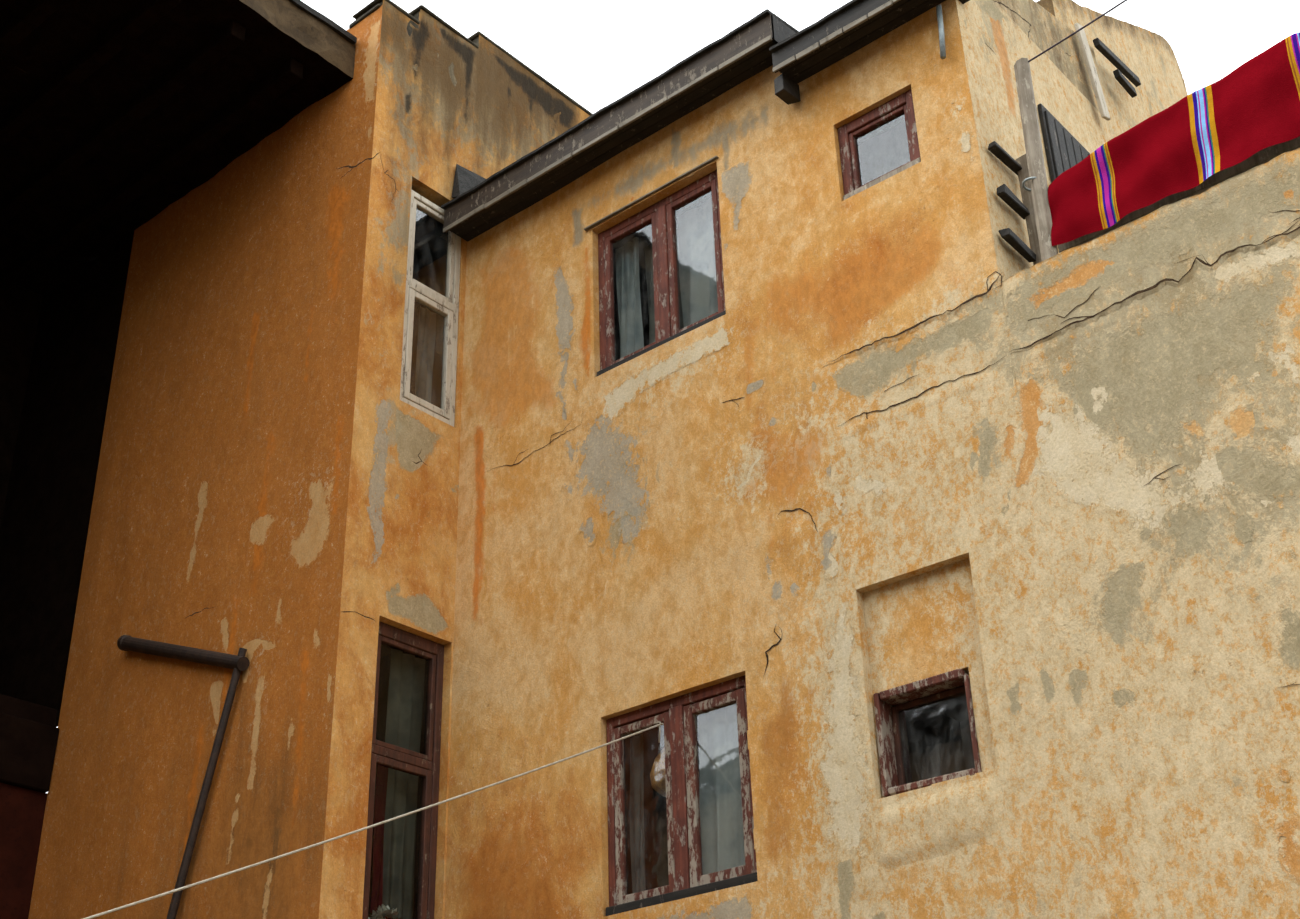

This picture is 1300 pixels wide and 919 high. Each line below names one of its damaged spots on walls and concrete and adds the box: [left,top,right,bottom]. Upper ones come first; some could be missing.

flaking render [553,262,580,420]
flaking render [832,308,993,402]
crack [822,210,1300,427]
flaking render [395,409,441,475]
crack [493,422,582,469]
flaking render [559,405,654,549]
flaking render [1055,255,1300,566]
peeling [247,514,277,546]
crack [764,625,782,674]
flaking render [1038,669,1089,710]
flaking render [1100,559,1148,646]
flaking render [1252,593,1300,672]